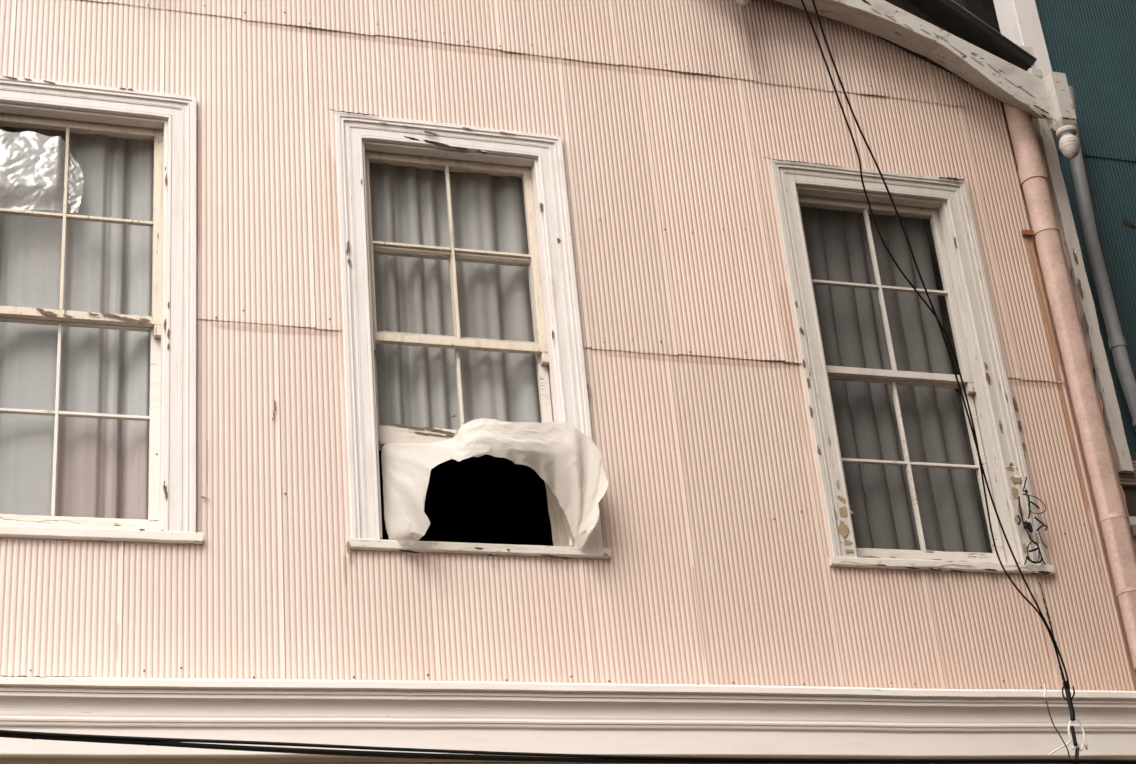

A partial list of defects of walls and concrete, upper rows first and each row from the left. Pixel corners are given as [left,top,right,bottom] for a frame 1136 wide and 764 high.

peeling [862,0,1053,122]
peeling [403,125,488,154]
peeling [1006,442,1026,525]